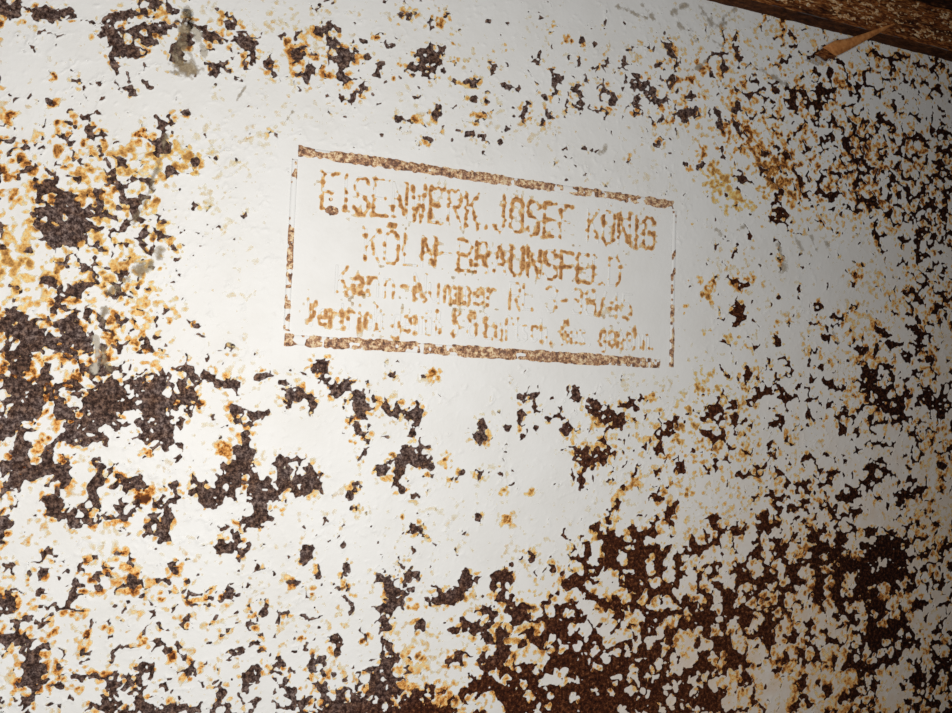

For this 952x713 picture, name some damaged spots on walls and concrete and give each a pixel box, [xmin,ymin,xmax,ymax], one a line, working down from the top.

corrosion [44,2,73,22]
corrosion [813,23,895,61]
corrosion [179,150,218,176]
corrosion [683,112,842,221]
corrosion [105,199,203,355]
peeling [0,541,251,713]